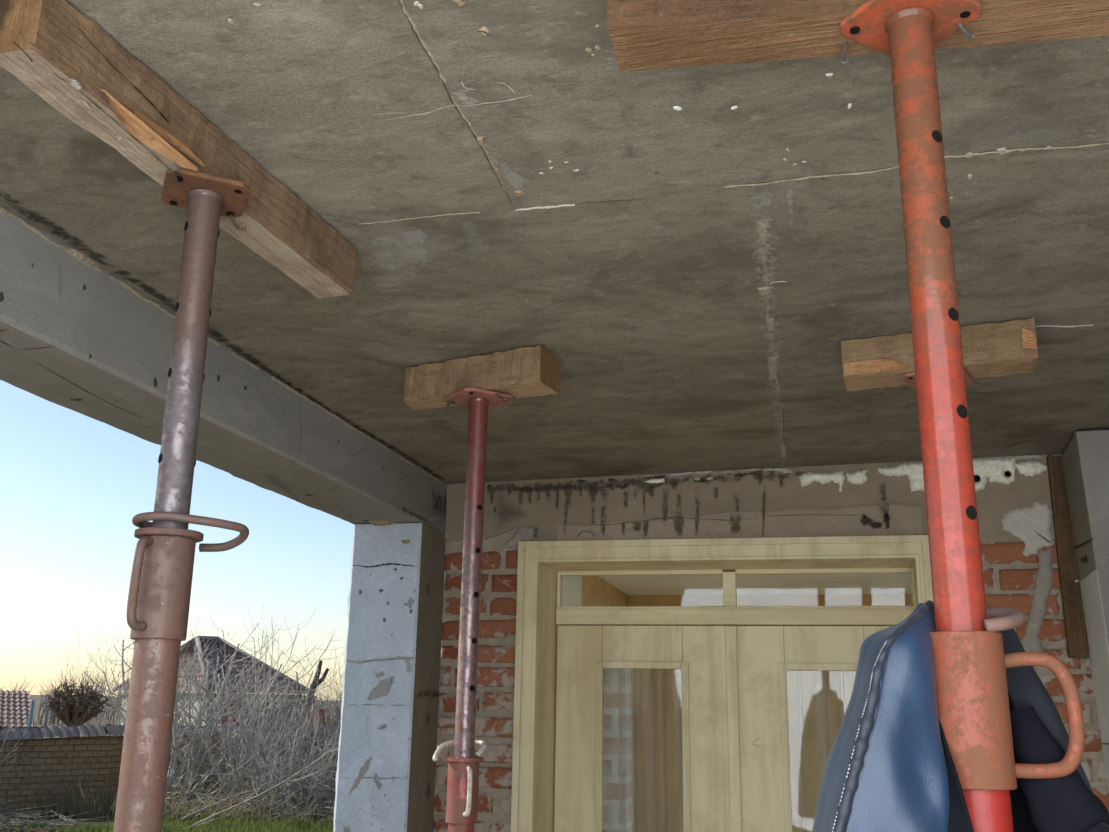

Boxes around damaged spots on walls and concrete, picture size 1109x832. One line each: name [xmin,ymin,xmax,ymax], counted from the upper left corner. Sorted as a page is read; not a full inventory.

crack [373,0,535,209]
leakage [488,193,801,536]
peeling [349,758,395,796]
peeling [369,671,393,700]